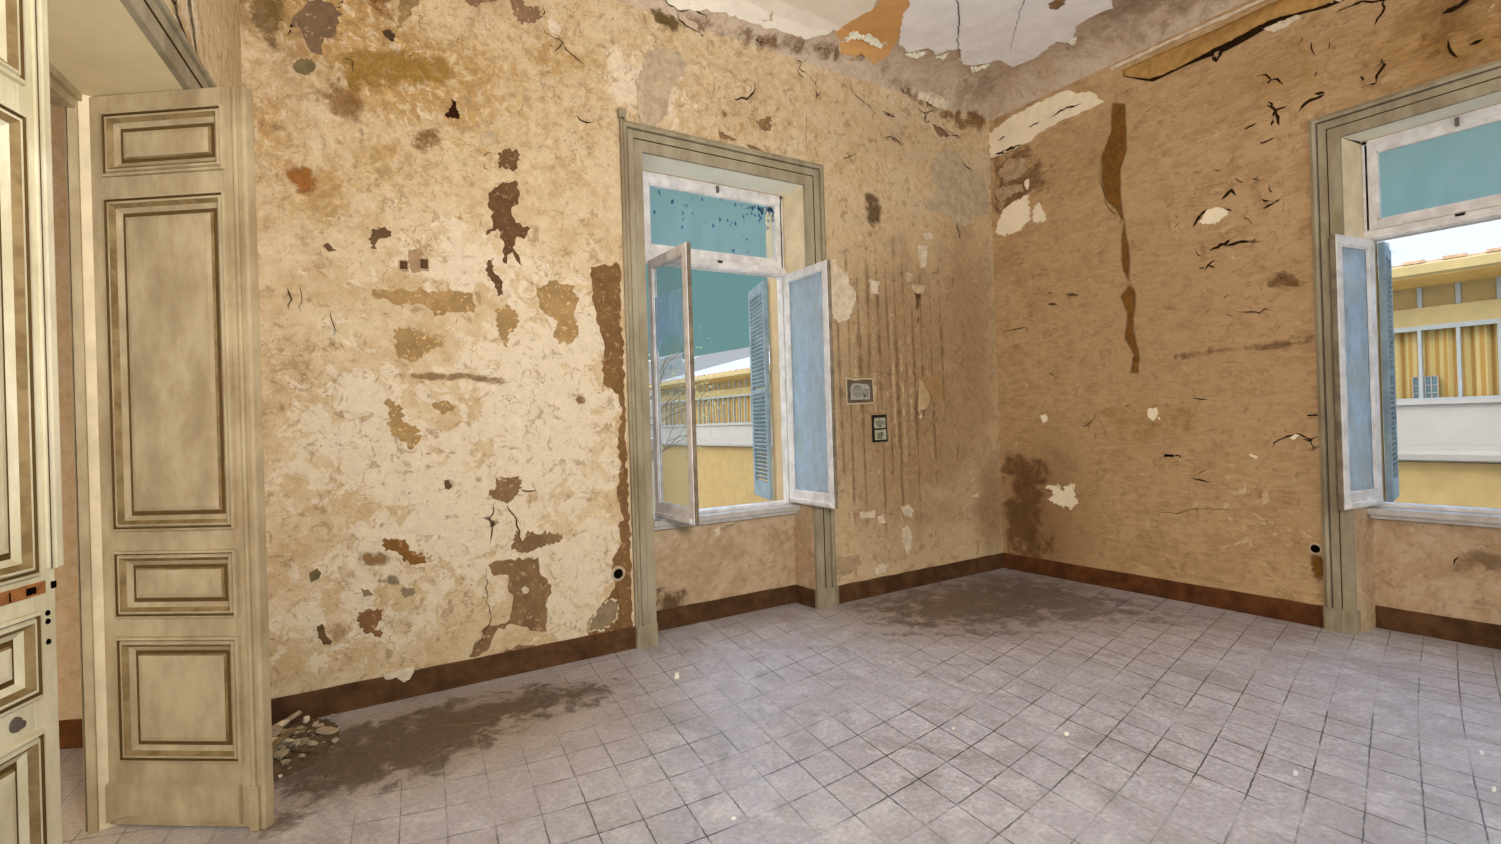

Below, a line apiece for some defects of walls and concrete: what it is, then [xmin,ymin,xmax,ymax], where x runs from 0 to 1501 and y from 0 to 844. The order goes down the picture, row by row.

flaking render [282,0,349,79]
flaking render [667,0,1113,73]
peeling [989,90,1105,236]
leakage [1102,104,1139,373]
peeling [1199,207,1229,225]
flaking render [364,144,635,636]
peeling [1045,483,1079,510]
flaking render [464,527,566,660]